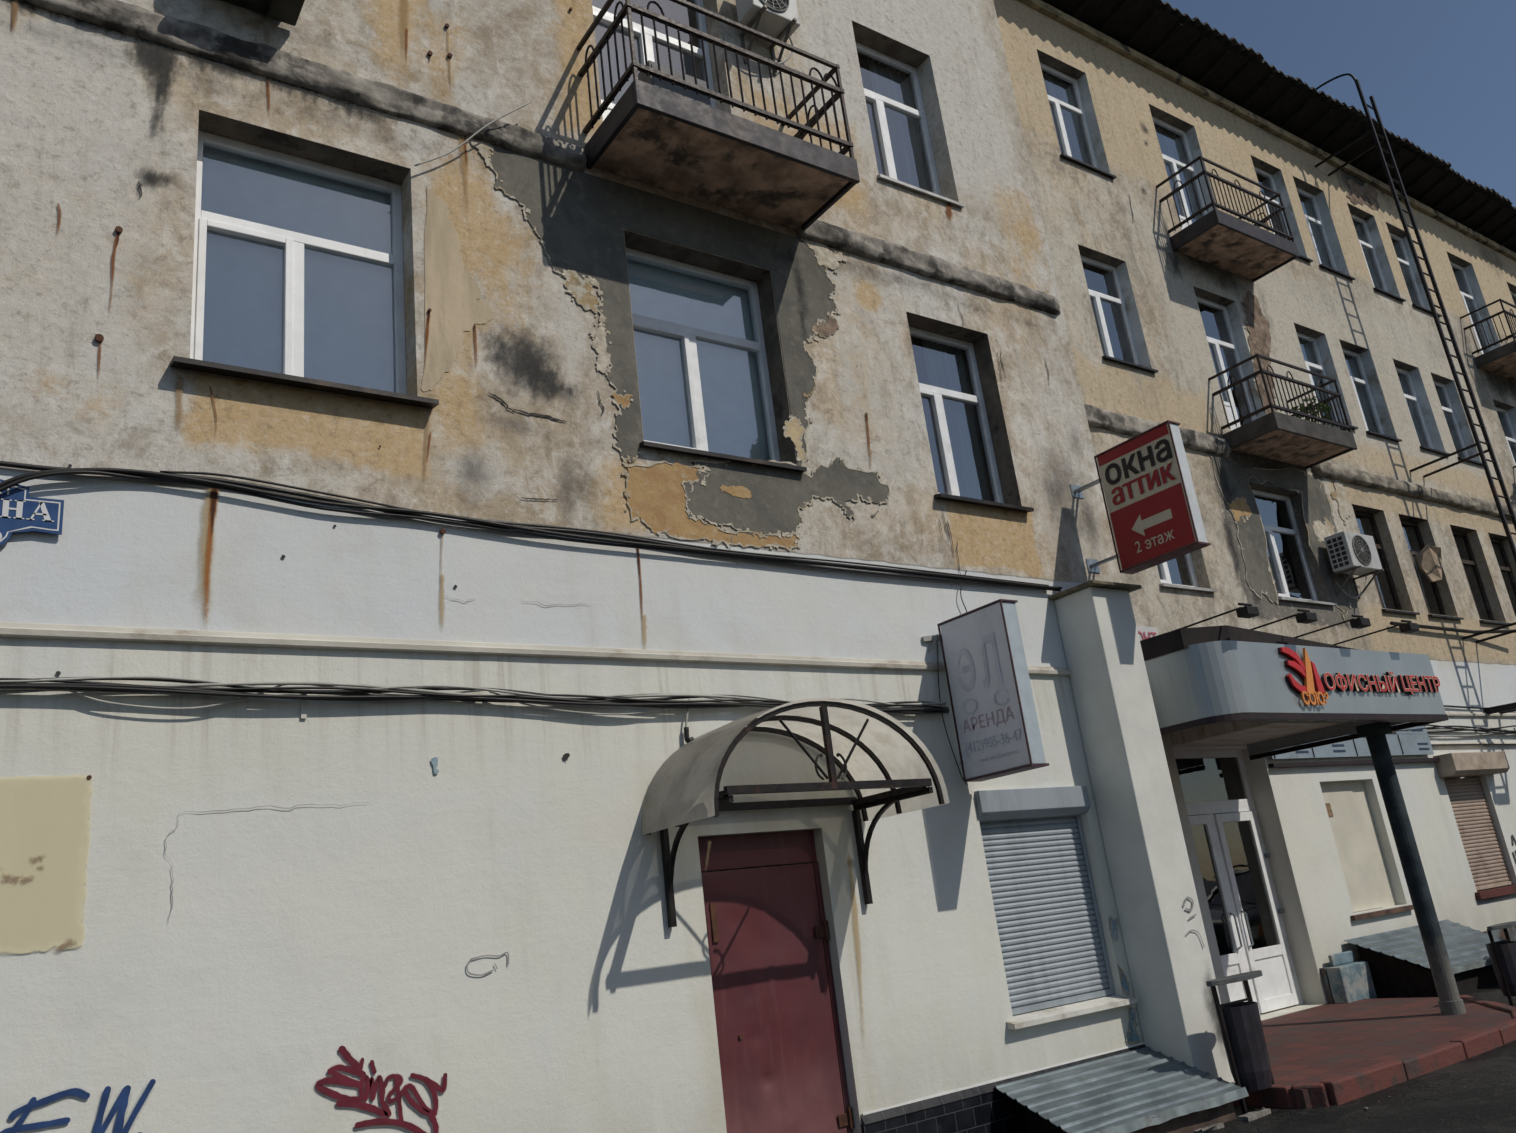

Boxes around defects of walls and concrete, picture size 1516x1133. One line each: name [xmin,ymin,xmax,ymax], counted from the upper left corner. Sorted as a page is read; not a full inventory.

leakage [74,18,253,133]
leakage [271,78,318,100]
rust [110,226,123,303]
flaking render [466,136,890,551]
rust [200,488,218,617]
crack [165,802,369,923]